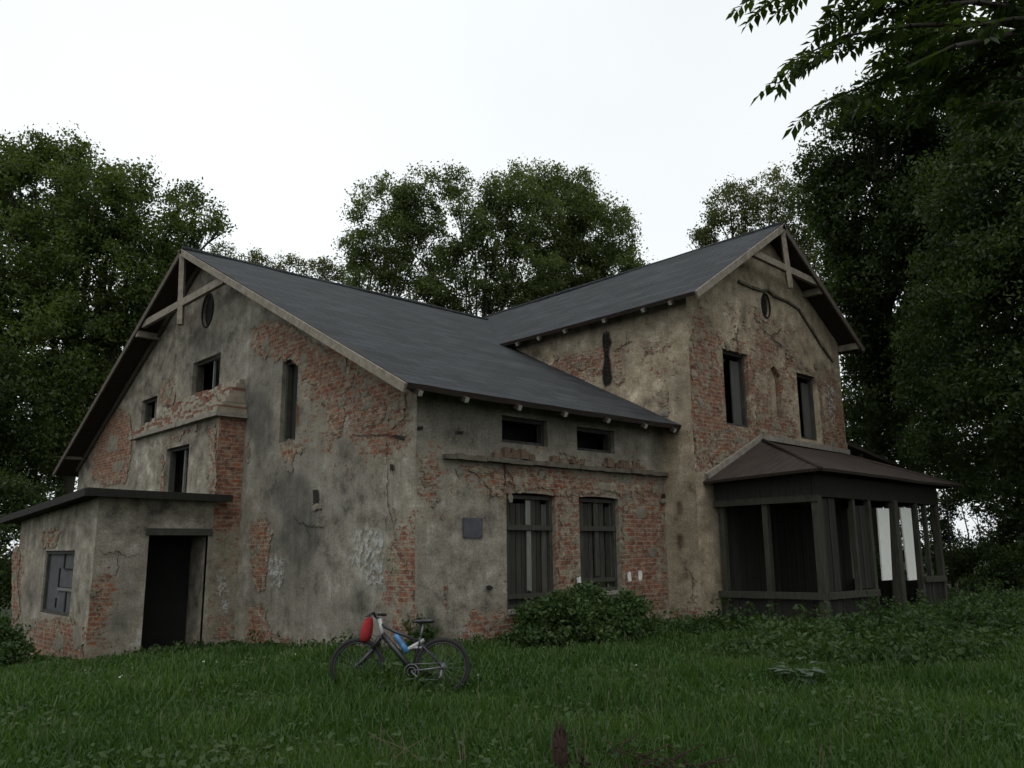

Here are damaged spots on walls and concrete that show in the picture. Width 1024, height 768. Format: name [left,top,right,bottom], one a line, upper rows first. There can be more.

flaking render [92,407,132,486]
flaking render [250,319,358,438]
crack [348,431,412,531]
flaking render [690,326,753,463]
flaking render [11,544,91,660]
flaking render [214,518,297,646]
flaking render [455,464,668,618]